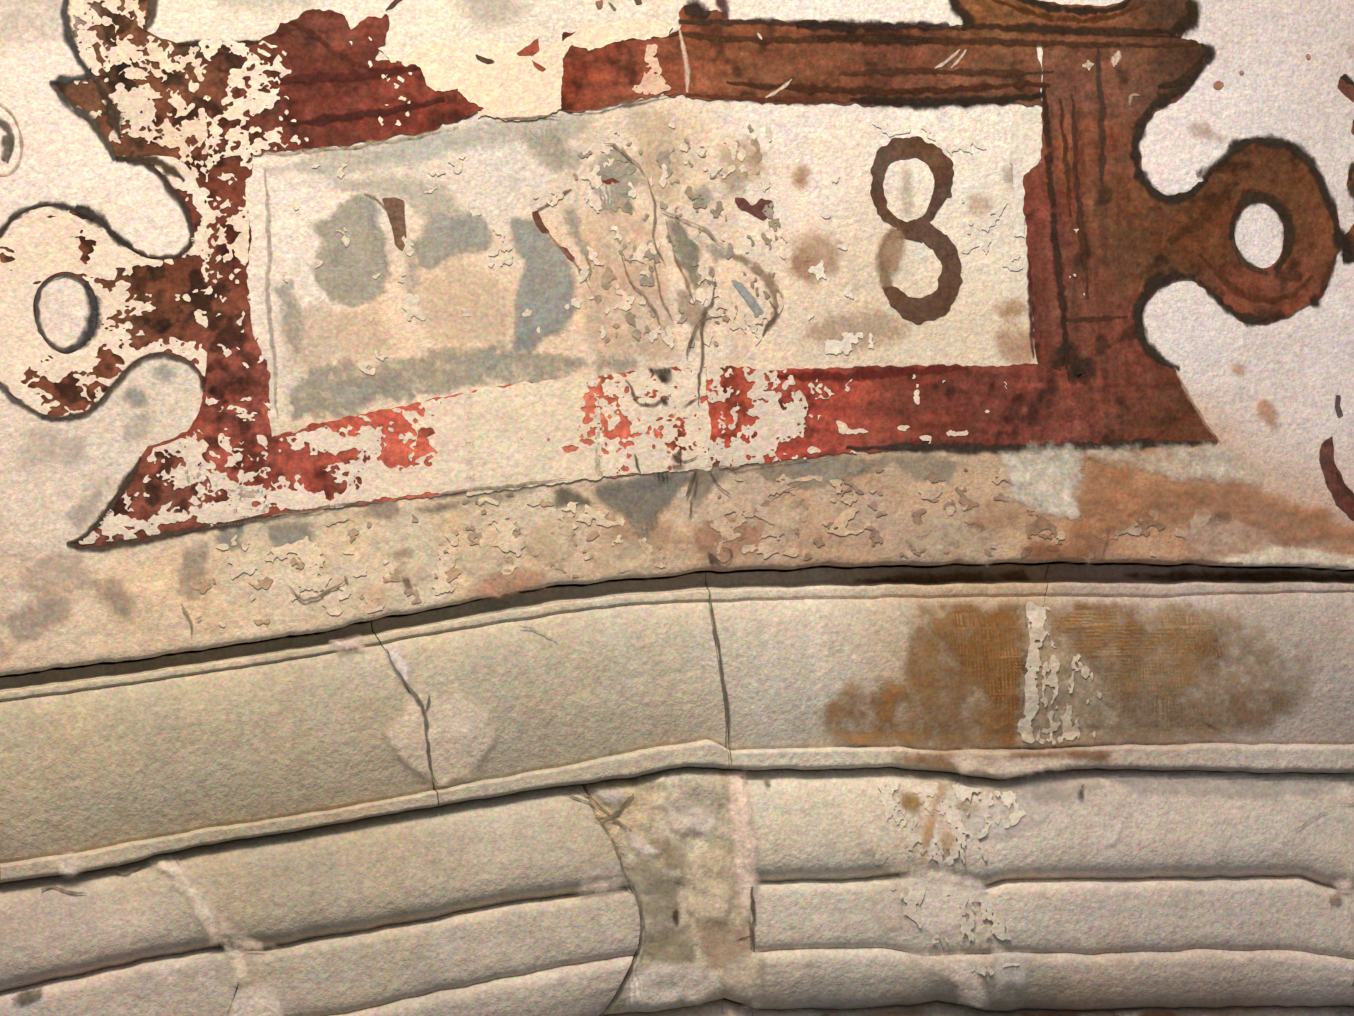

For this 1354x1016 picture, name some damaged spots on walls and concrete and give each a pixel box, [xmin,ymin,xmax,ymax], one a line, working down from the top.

peeling [0,0,308,417]
peeling [79,20,1261,615]
crack [386,649,438,784]
crack [705,548,732,758]
peeling [878,601,1128,869]
crack [565,787,645,1014]